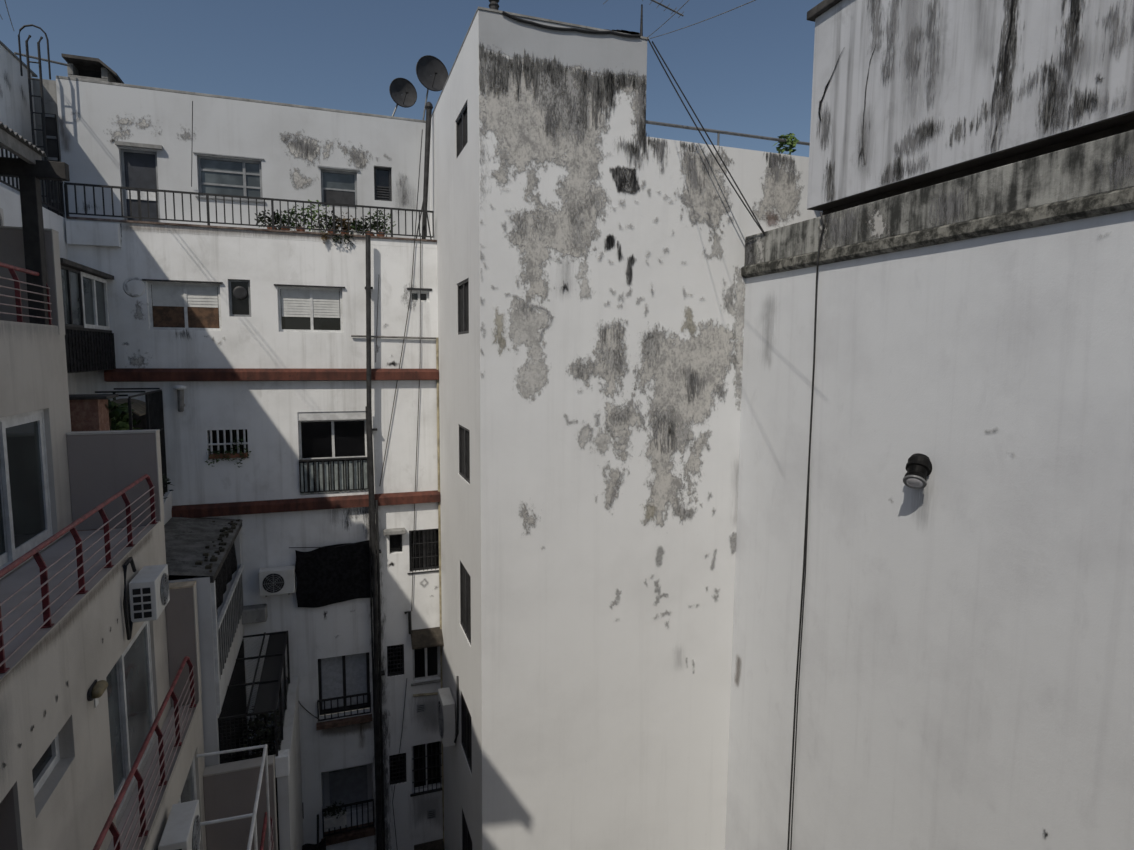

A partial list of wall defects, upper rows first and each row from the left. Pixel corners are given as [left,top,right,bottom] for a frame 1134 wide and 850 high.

peeling [281,133,390,189]
peeling [479,54,659,400]
leakage [479,45,665,172]
peeling [671,147,732,258]
peeling [753,162,801,228]
leakage [819,107,889,250]
leakage [868,0,1123,184]
leakage [1103,6,1134,57]
peeling [564,267,745,526]
spalling [521,504,537,534]